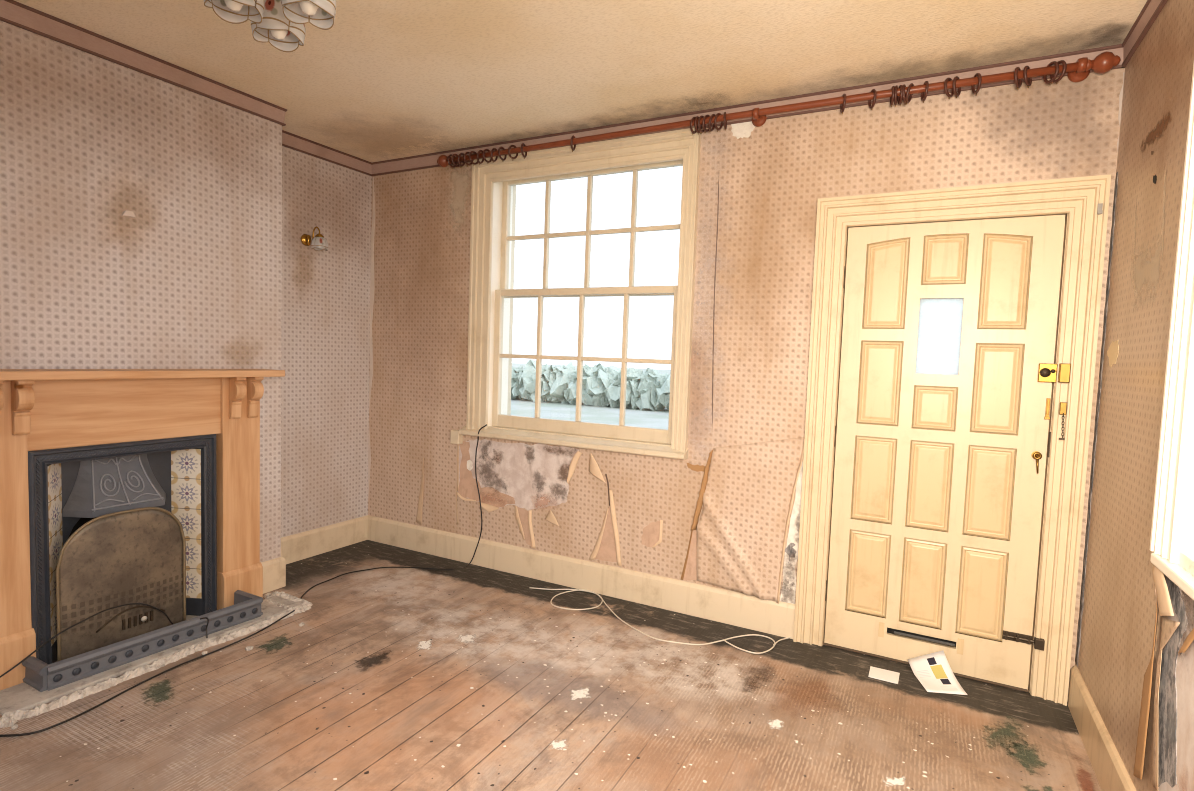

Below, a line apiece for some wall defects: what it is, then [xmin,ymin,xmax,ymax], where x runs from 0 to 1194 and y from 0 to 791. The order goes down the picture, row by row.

peeling [457,439,606,526]
peeling [1133,565,1194,791]